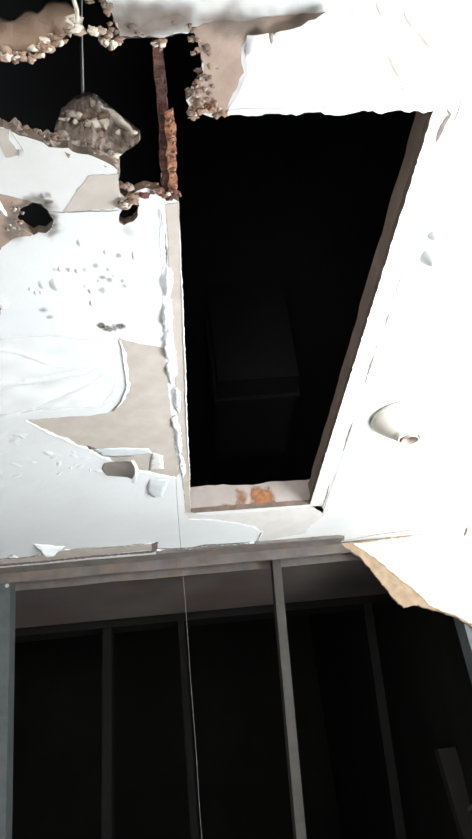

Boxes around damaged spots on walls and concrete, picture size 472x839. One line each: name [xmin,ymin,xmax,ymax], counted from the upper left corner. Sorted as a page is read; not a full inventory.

flaking render [84,0,139,51]
rust [150,37,167,52]
rust [168,119,177,179]
peeling [0,10,462,566]
rust [224,487,275,506]